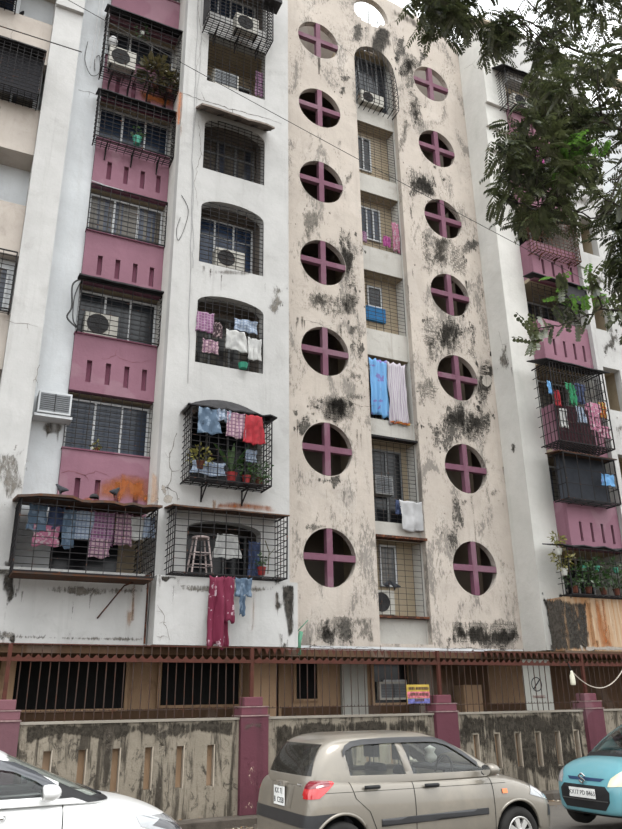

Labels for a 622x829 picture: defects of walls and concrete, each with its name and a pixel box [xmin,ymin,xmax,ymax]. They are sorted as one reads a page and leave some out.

damp [372,21,429,151]
damp [403,162,445,197]
damp [421,232,479,288]
damp [416,310,508,451]
damp [293,392,362,435]
rust [103,476,155,501]
damp [314,616,381,648]
damp [447,619,521,651]
rust [587,600,610,646]
damp [26,723,158,743]
damp [169,721,233,737]
damp [464,709,584,781]